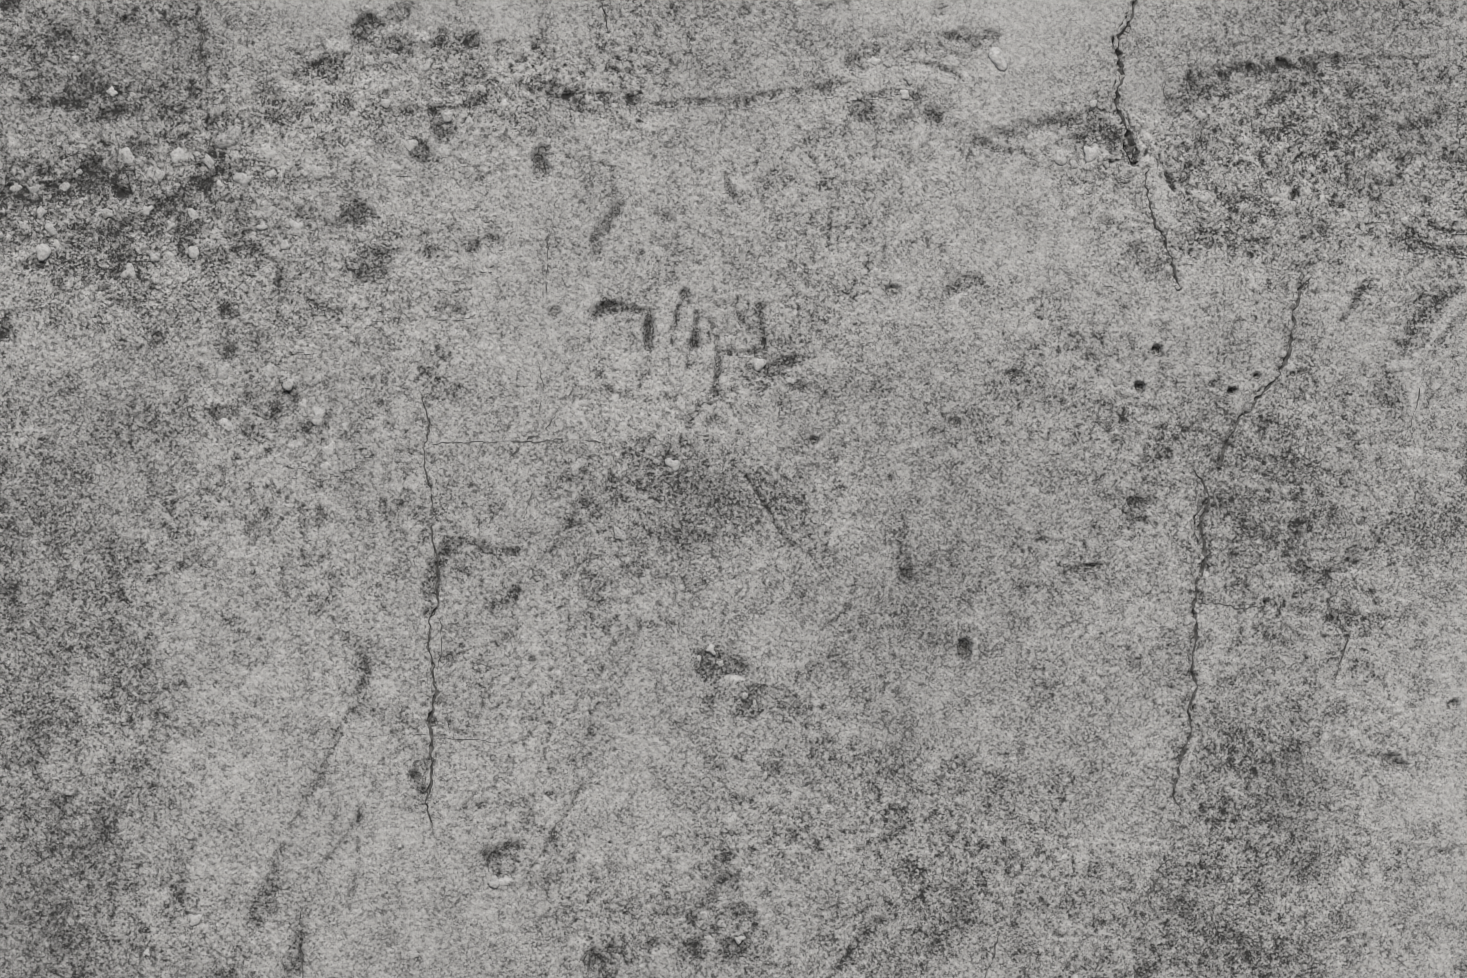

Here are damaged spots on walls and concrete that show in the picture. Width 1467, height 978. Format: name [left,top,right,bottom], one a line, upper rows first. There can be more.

crack [545,200,557,294]
crack [1111,0,1183,290]
crack [364,353,615,886]
crack [1140,273,1323,962]